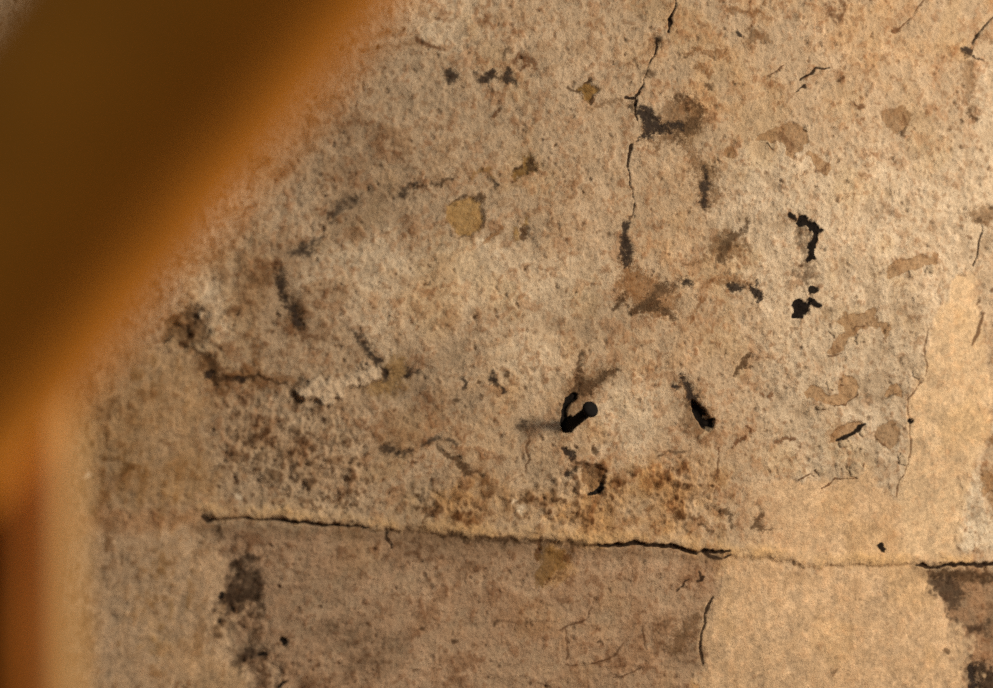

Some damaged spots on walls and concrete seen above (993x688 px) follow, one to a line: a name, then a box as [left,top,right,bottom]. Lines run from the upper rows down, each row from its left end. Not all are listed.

crack [625,0,676,216]
peeling [788,212,823,262]
peeling [792,285,823,319]
hole [671,373,718,444]
crack [201,515,392,548]
crack [916,561,993,585]
damp [927,574,965,621]